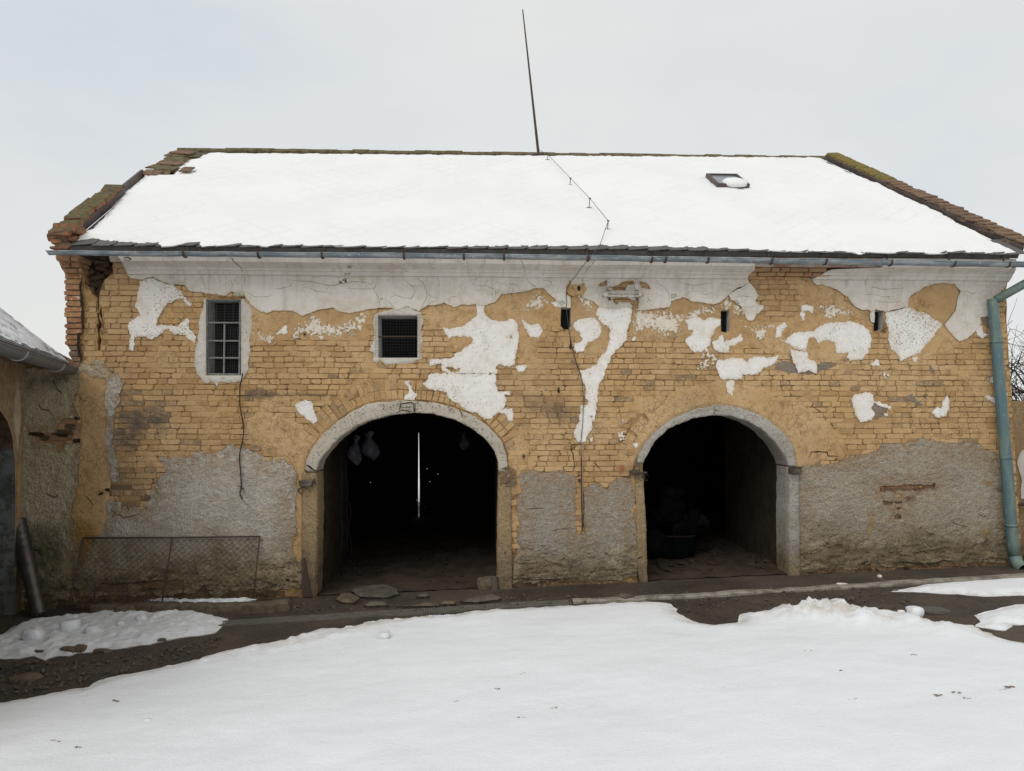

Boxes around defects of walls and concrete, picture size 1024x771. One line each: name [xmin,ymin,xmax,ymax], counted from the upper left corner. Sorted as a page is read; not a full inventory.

crack [77,255,131,362]
flaking render [128,278,197,351]
flaking render [256,310,369,343]
flaking render [404,291,560,422]
crack [655,282,754,307]
flaking render [566,279,959,442]
spalling [13,382,81,528]
spalling [74,360,158,507]
flaking render [295,400,318,424]
spalling [499,467,517,487]
spalling [616,415,643,470]
spalling [880,483,935,508]